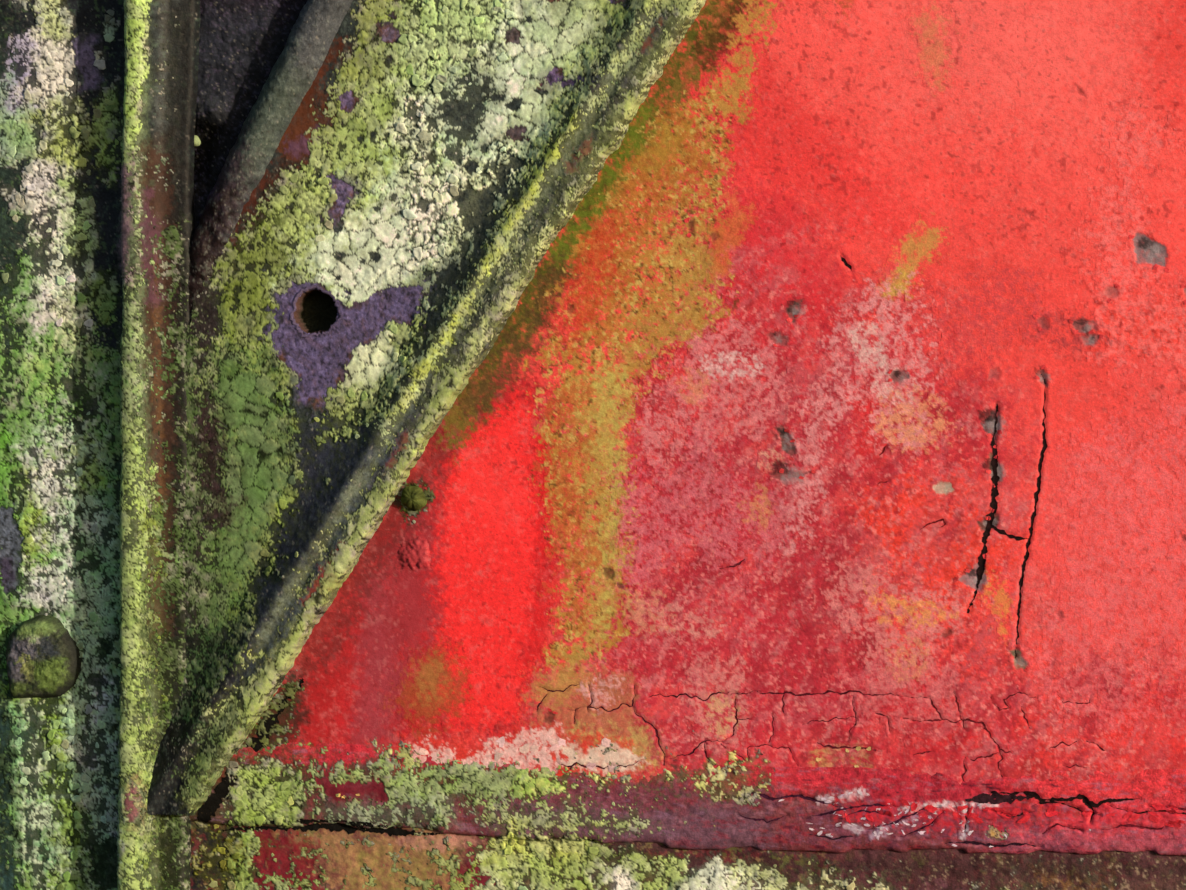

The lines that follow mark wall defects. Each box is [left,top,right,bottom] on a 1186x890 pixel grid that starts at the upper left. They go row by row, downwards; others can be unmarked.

peeling [1128,231,1172,273]
crack [967,374,1048,659]
crack [537,684,1186,848]
peeling [808,785,1186,847]